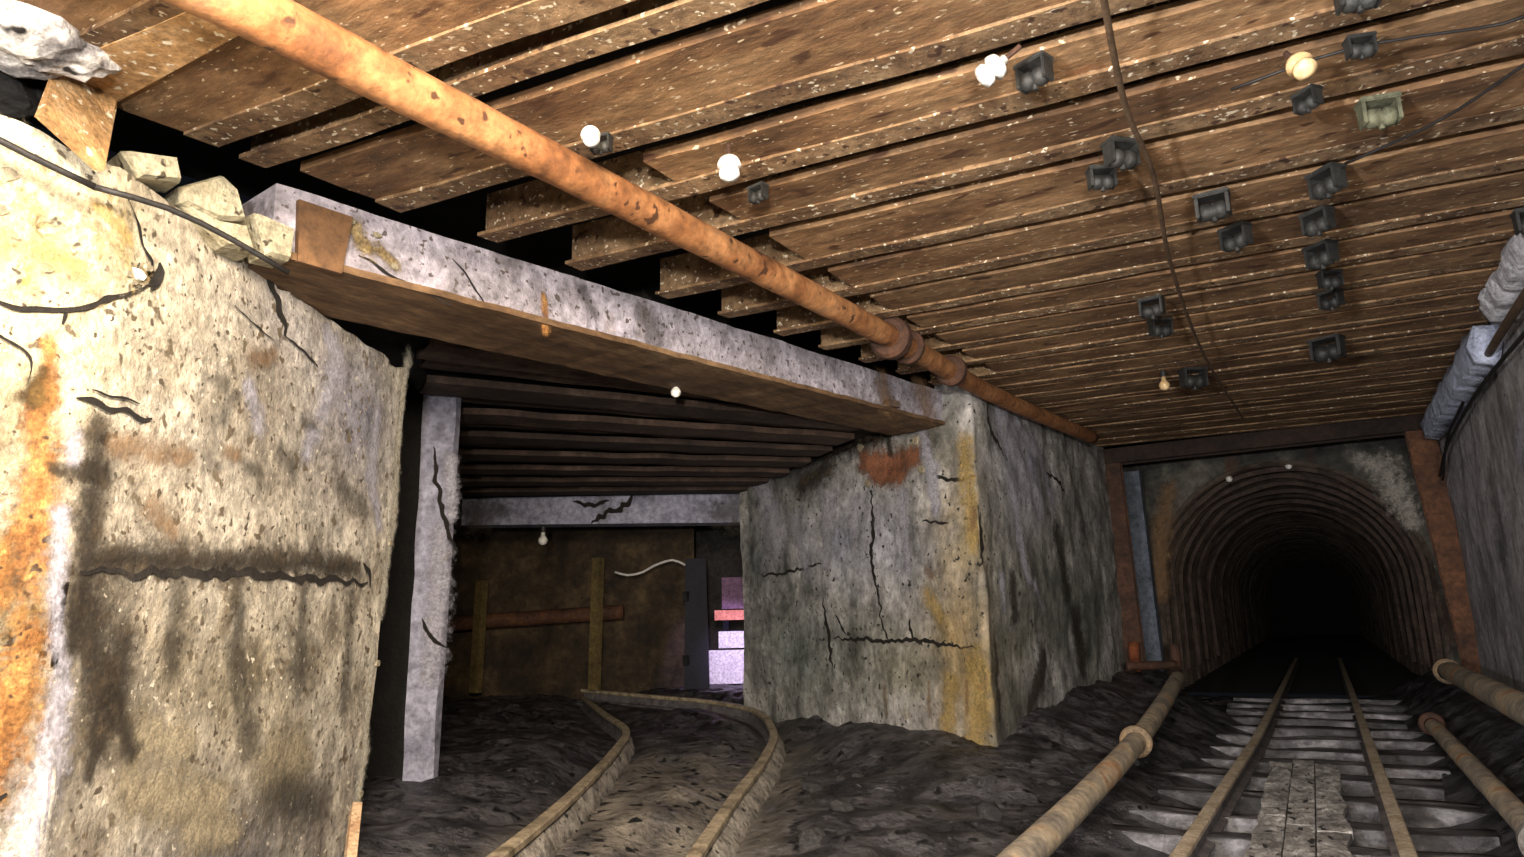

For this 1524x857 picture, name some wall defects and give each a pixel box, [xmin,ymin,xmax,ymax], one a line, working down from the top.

crack [0,199,165,381]
crack [235,279,318,367]
crack [432,446,457,552]
crack [572,494,634,524]
rust [0,334,60,804]
crack [80,563,371,587]
crack [421,618,448,648]
crack [761,491,977,671]